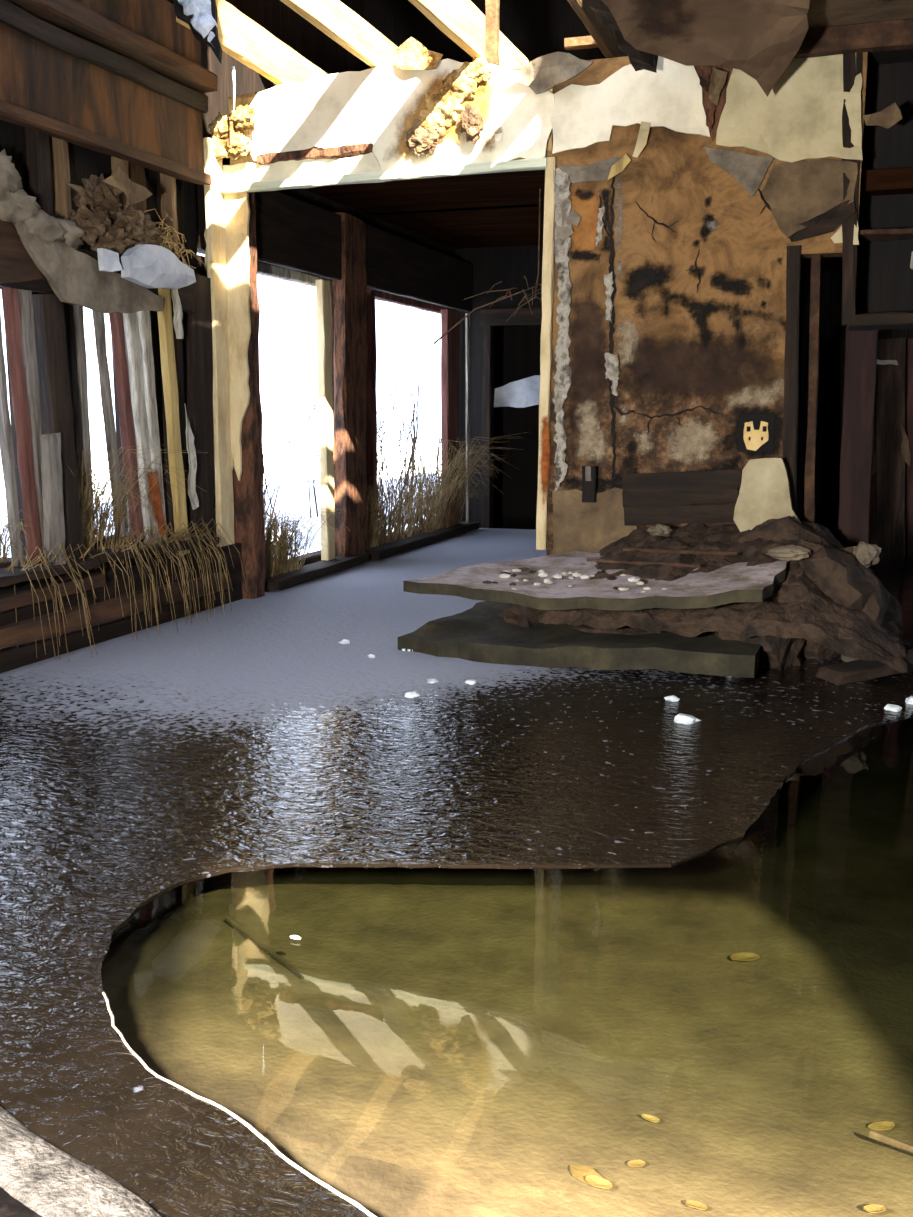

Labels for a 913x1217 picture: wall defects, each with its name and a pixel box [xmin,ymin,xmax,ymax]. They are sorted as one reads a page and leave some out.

peeling [693,65,859,246]
damp [566,262,786,492]